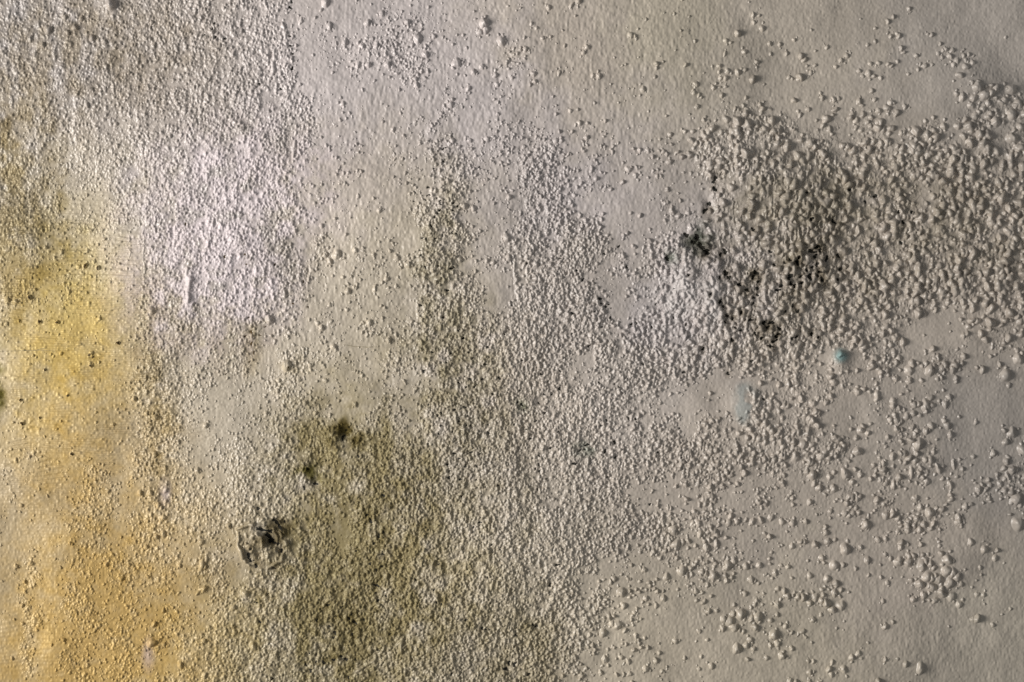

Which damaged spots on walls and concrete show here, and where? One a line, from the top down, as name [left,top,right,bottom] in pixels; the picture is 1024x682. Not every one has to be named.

damp [104,139,300,530]
spalling [183,95,693,682]
damp [683,233,728,257]
damp [708,270,820,348]
damp [768,245,842,292]
damp [0,422,49,553]
damp [256,518,286,553]
damp [0,539,88,682]